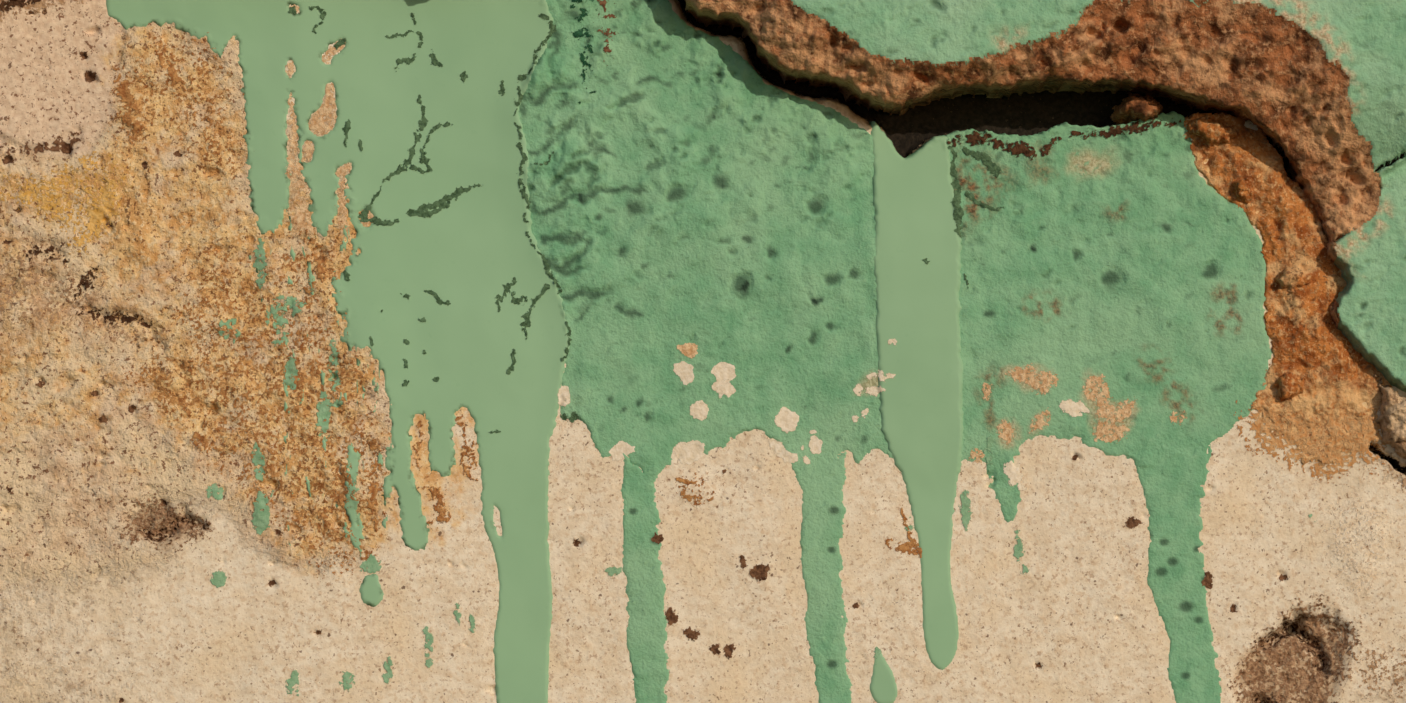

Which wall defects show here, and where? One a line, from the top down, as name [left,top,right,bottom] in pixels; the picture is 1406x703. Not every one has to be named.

peeling [322,41,345,64]
peeling [285,60,338,237]
crack [1375,151,1406,172]
peeling [335,163,374,239]
spalling [684,0,1398,491]
peeling [673,343,698,385]
peeling [609,441,635,461]
peeling [673,440,705,465]
spalling [136,499,210,544]